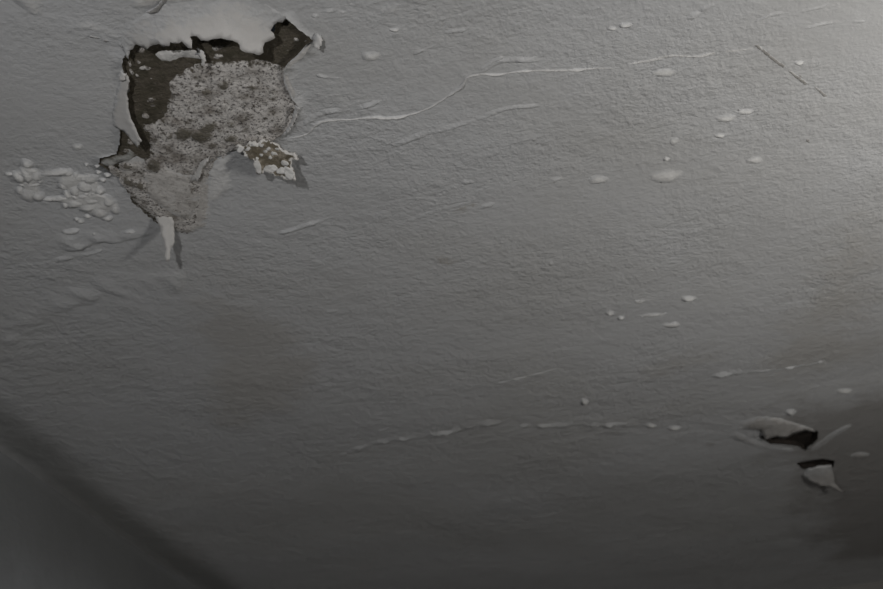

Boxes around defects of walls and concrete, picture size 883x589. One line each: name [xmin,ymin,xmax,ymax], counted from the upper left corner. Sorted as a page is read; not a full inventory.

spalling [99,0,323,262]
spalling [730,409,852,492]